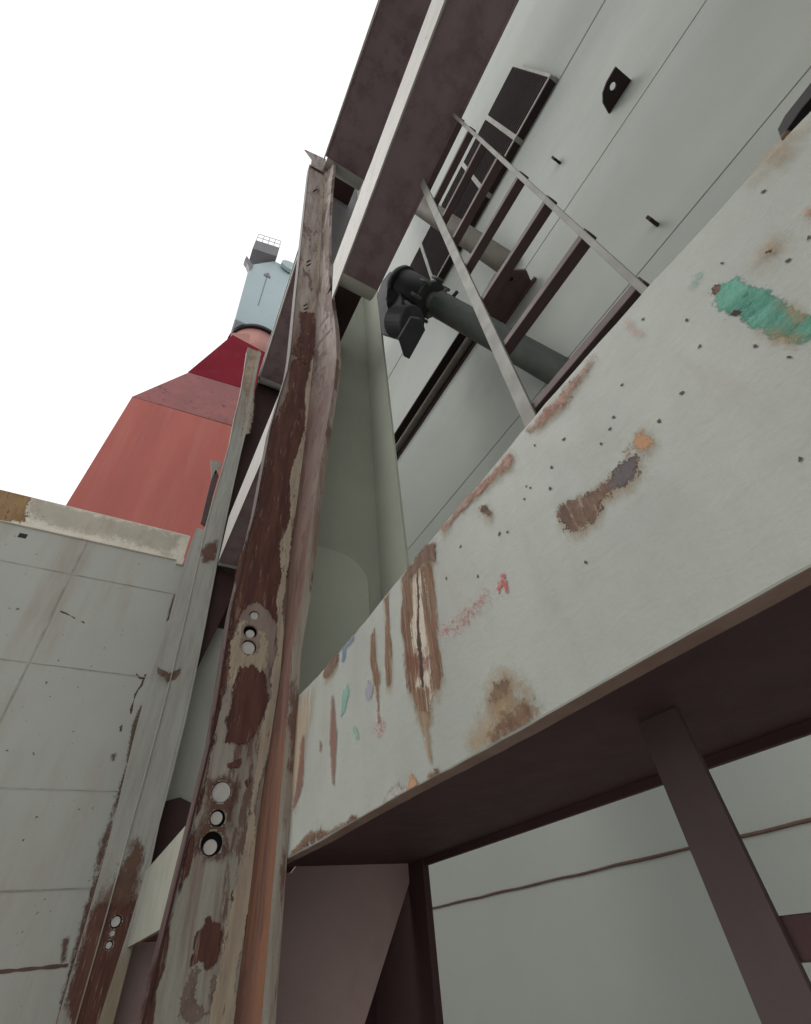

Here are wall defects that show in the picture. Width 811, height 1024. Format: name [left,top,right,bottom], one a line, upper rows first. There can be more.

corrosion [200,541,217,563]
corrosion [157,667,182,684]
corrosion [319,696,336,784]
corrosion [370,560,443,778]
corrosion [470,673,535,745]
corrosion [60,706,142,1010]